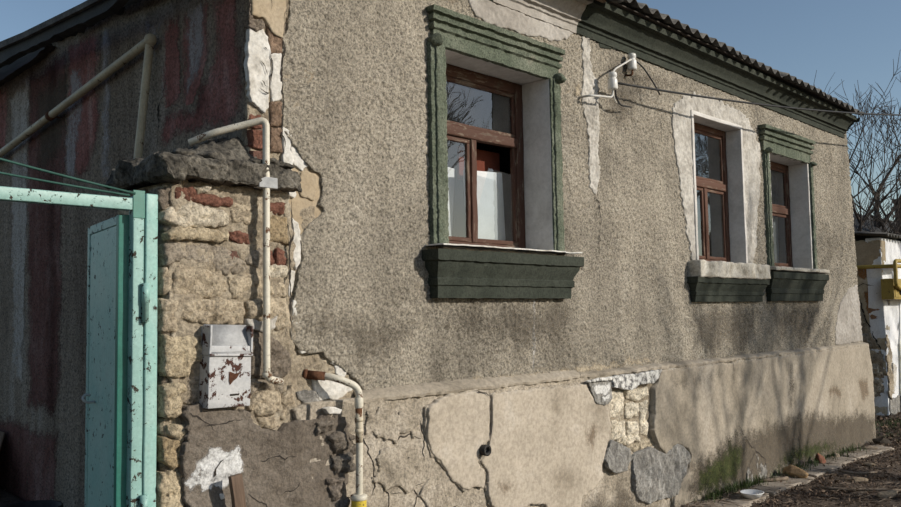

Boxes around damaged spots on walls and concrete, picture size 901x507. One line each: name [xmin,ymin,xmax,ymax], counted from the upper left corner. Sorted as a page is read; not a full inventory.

crack [279,41,287,148]
flaking render [240,0,322,323]
flaking render [855,241,880,265]
flaking render [291,348,357,421]
crack [354,419,425,507]
spalling [423,402,468,492]
crack [474,390,492,455]
spalling [478,455,492,507]
flaking render [453,354,787,453]
flaking render [746,454,767,483]
leakage [689,412,876,497]
flaking render [798,308,897,400]